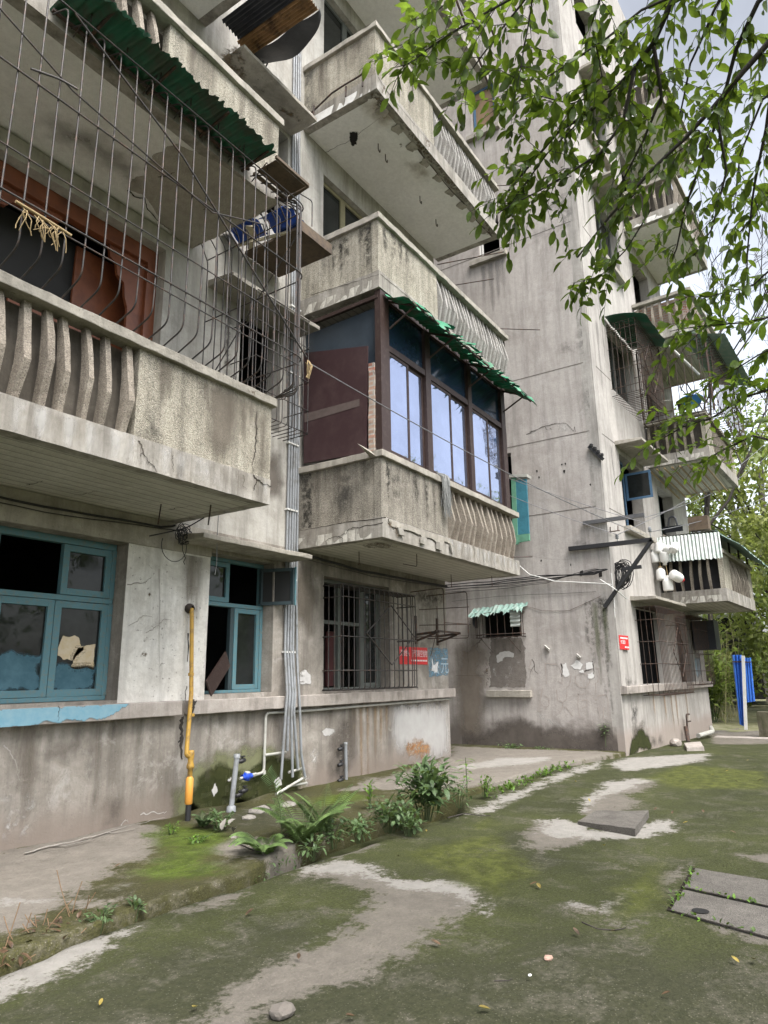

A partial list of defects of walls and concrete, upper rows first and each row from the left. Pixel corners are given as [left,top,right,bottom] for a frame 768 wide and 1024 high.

crack [243,412,271,492]
water stain [302,474,312,529]
peeling [0,704,128,727]
water stain [458,643,618,751]